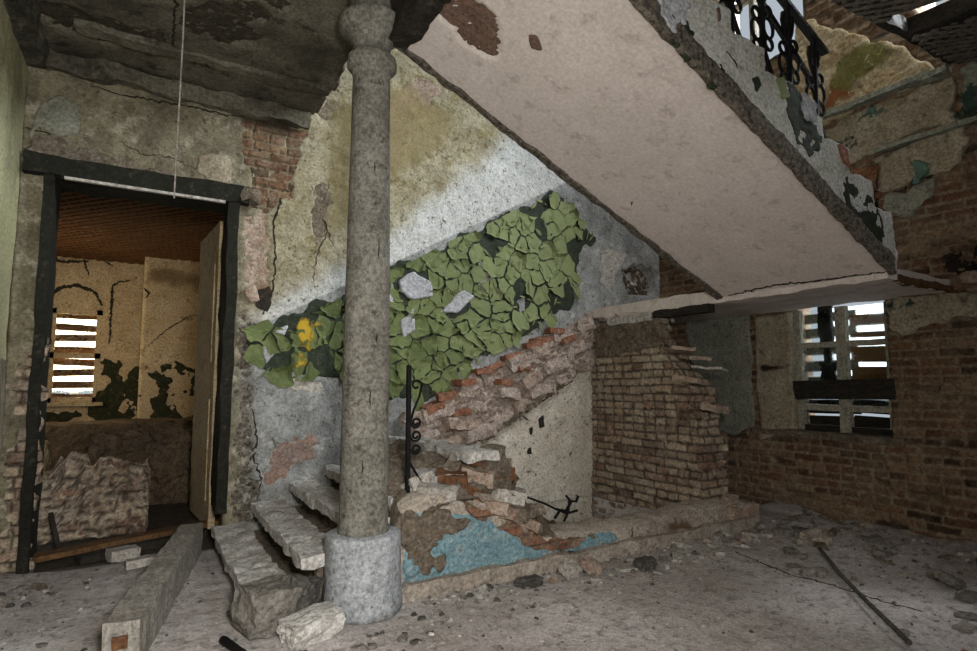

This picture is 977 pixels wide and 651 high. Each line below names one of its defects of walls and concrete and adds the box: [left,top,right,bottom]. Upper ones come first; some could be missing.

spalling [529,34,542,51]
spalling [629,0,977,293]
spalling [0,349,32,573]
peeling [33,359,195,522]
peeling [231,119,345,524]
peeling [389,190,675,582]